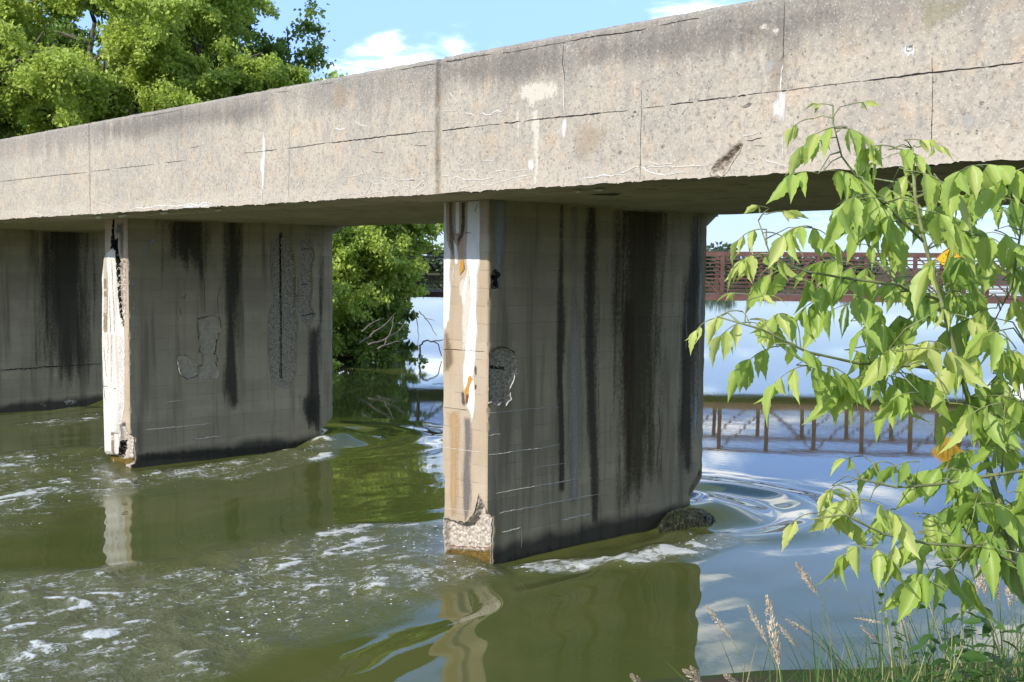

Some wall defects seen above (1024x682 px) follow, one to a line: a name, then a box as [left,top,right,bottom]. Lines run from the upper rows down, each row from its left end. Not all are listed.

crack [247,1,1022,196]
spalling [709,142,742,176]
crack [29,197,256,326]
leakage [224,223,243,406]
spalling [268,232,316,389]
leakage [303,260,323,431]
rust [450,367,476,513]
spalling [488,347,552,414]
leakage [557,205,598,522]
leakage [613,210,667,498]
leakage [679,214,702,468]
spalling [443,494,597,564]